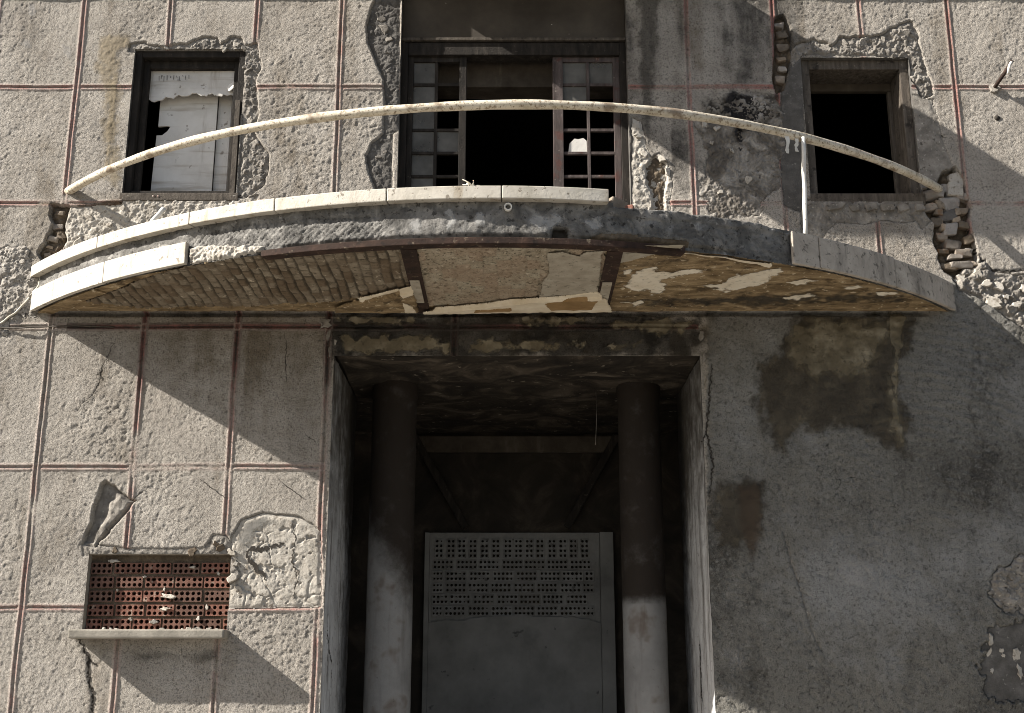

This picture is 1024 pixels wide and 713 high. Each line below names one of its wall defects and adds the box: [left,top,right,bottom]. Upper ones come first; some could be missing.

peeling [40,37,269,259]
spalling [367,0,400,189]
peeling [631,118,672,211]
peeling [694,19,932,219]
spalling [86,230,815,370]
spalling [801,172,1024,328]
crack [701,365,715,499]
leakage [641,292,916,452]
spalling [83,483,322,609]
leakage [709,479,764,551]
spalling [988,554,1024,615]
crack [78,639,98,713]